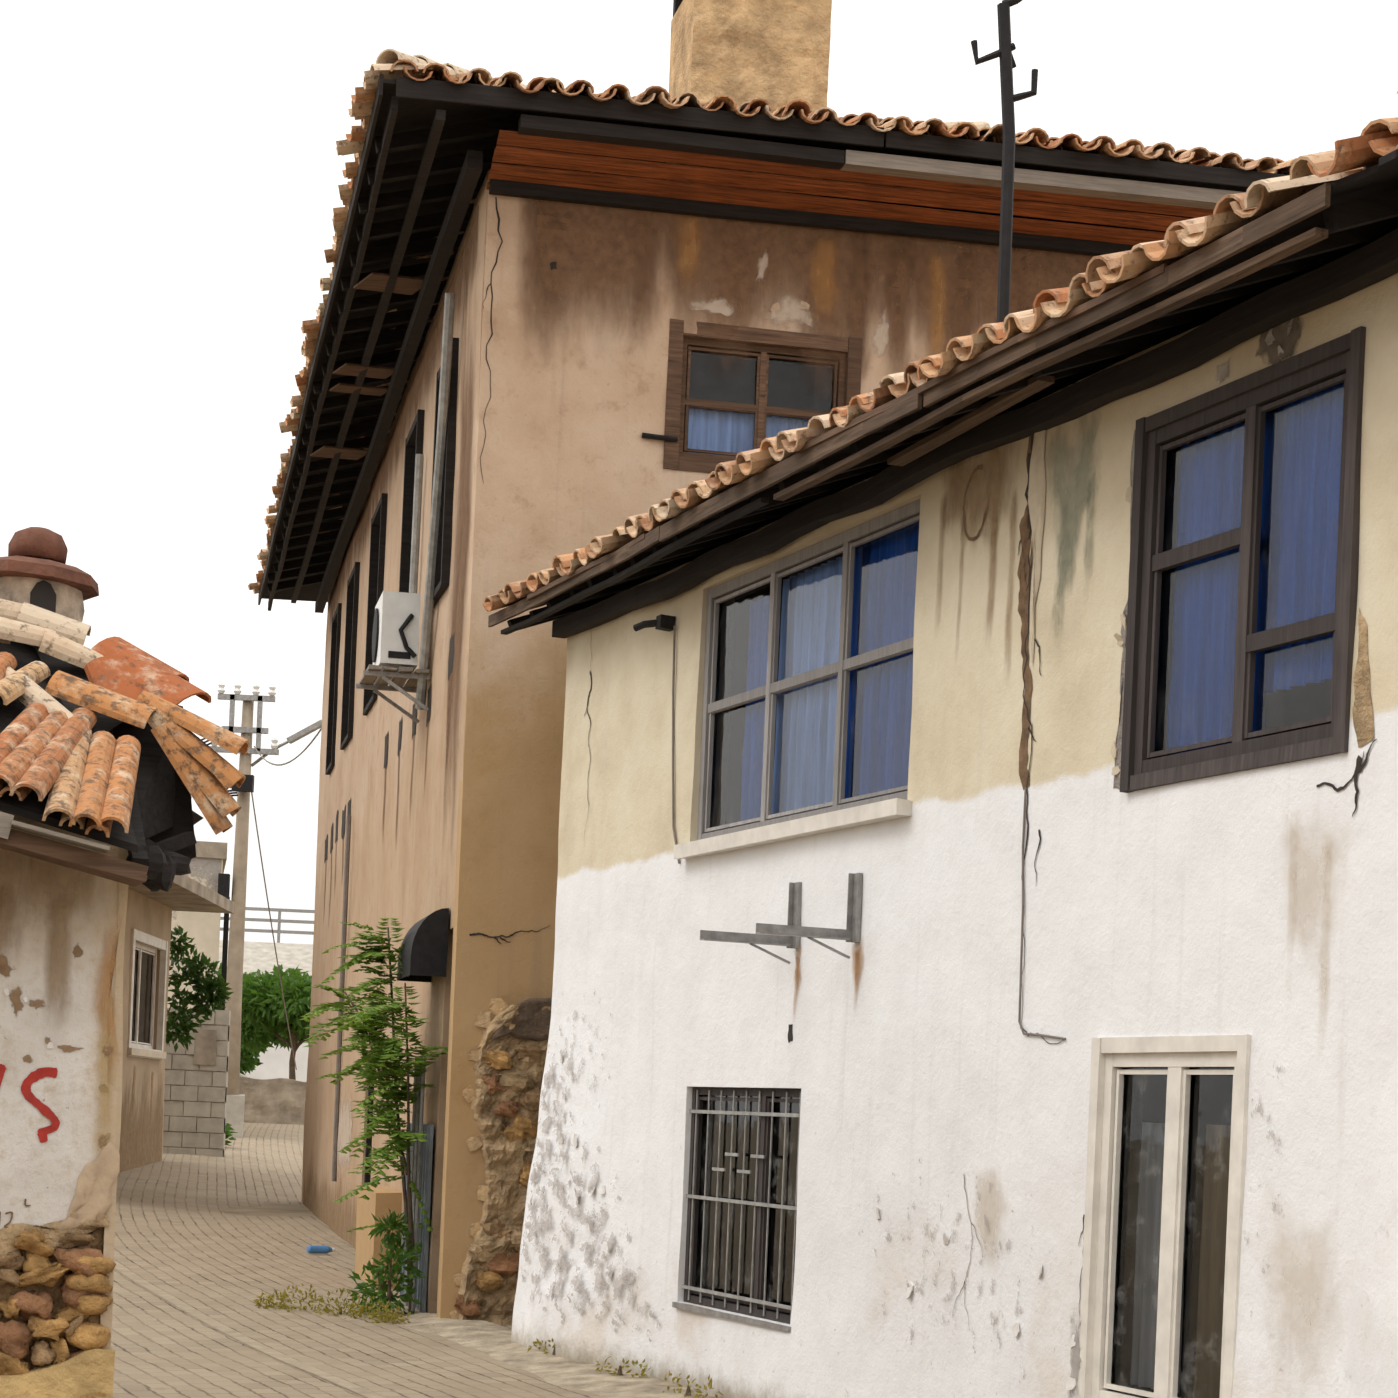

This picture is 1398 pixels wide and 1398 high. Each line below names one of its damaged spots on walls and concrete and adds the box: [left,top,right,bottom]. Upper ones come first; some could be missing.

crack [480,197,503,483]
peeling [692,300,732,316]
water stain [528,199,1094,360]
water stain [1054,433,1093,575]
crack [1018,435,1041,879]
crack [1316,739,1377,817]
spalling [0,955,44,1016]
spalling [45,1037,83,1052]
crack [469,925,550,944]
rust [853,950,861,979]
spalling [449,997,664,1341]
spalling [0,1134,120,1375]